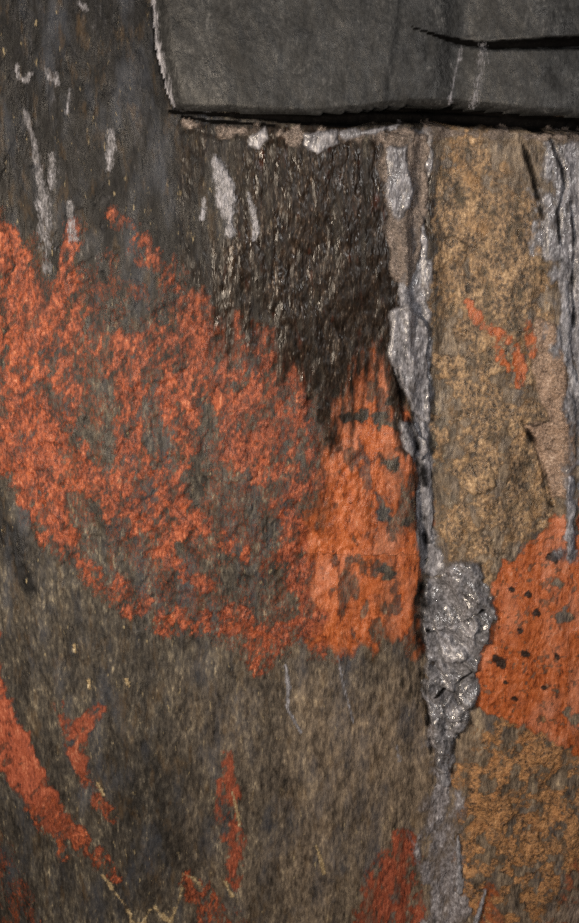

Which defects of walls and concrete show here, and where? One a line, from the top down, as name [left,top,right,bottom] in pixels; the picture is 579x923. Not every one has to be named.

crack [412,26,579,49]
rust [0,205,426,677]
damp [186,124,443,577]
rust [464,298,536,389]
damp [529,129,579,563]
rust [0,679,121,884]
rust [181,870,231,923]
rust [216,752,246,891]
damp [285,664,302,733]
rust [353,829,426,923]
efflorescence [410,724,487,923]
rust [475,514,579,756]